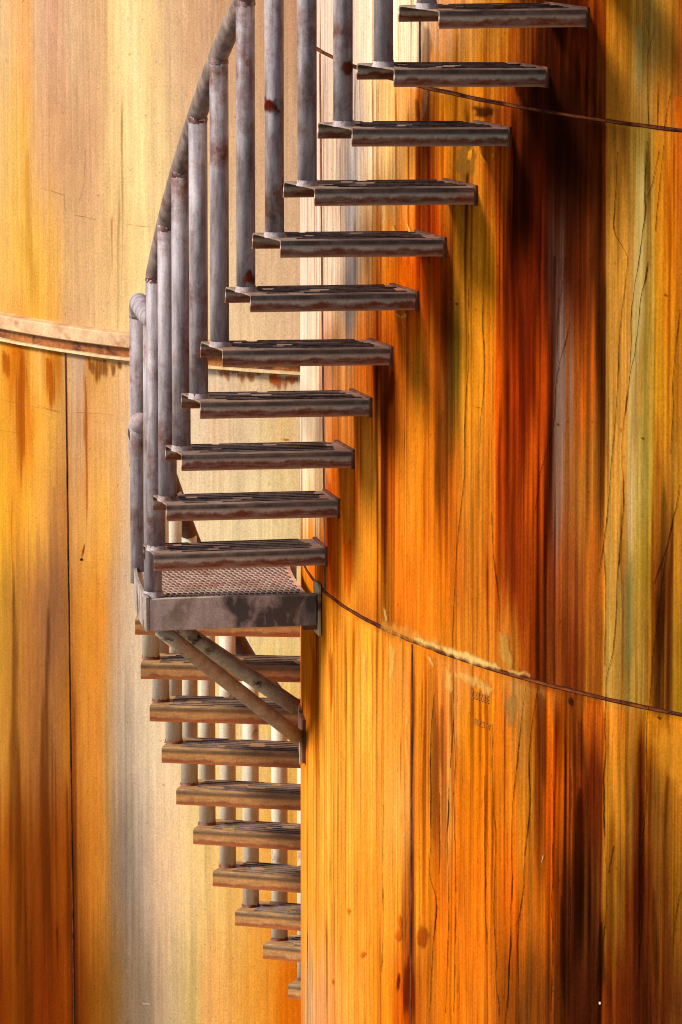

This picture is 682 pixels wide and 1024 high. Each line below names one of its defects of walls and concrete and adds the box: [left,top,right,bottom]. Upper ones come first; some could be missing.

rust [3,352,24,463]
rust [83,358,121,520]
crack [599,88,670,1000]
crack [484,687,571,1024]